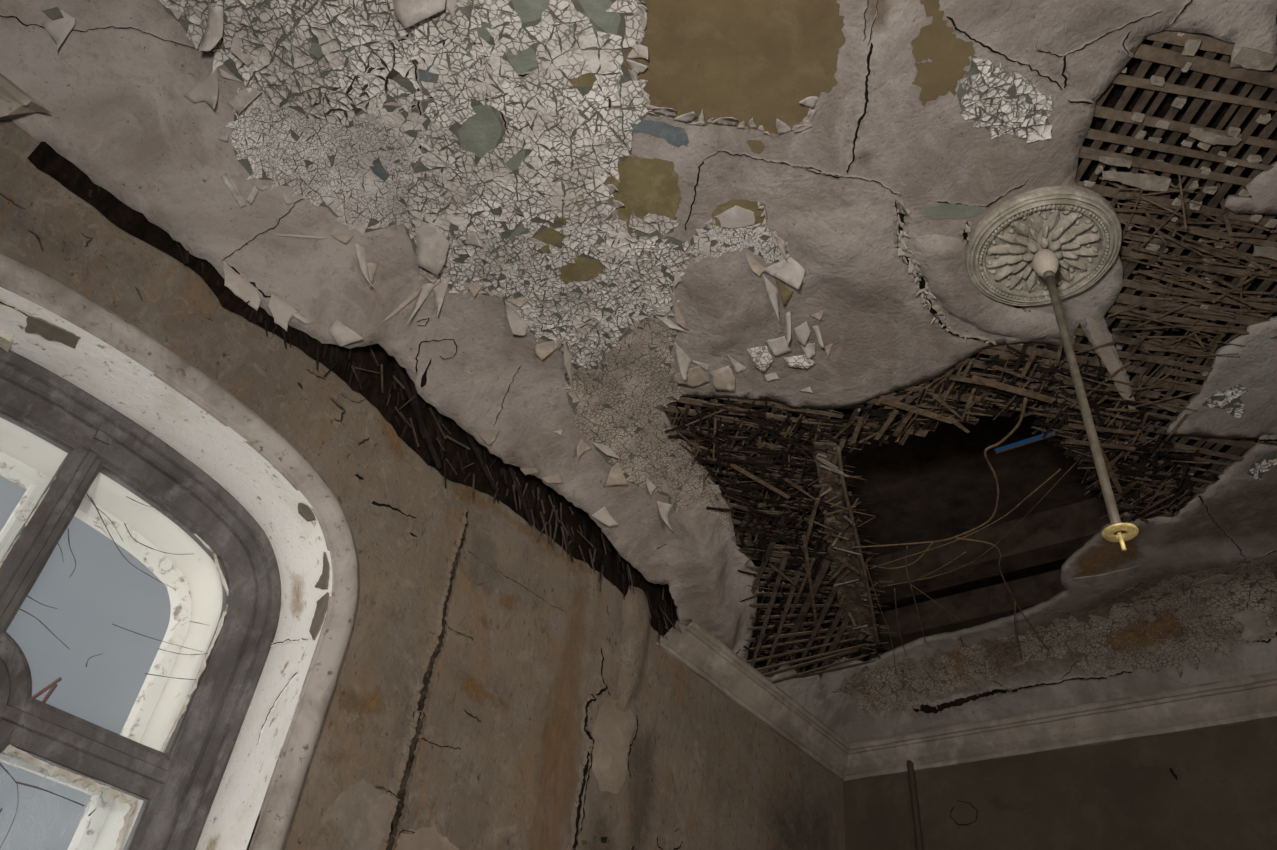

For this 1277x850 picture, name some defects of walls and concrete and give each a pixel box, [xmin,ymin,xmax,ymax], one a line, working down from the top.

crack [683,0,902,231]
crack [945,0,1194,106]
peeling [0,316,81,352]
flaking render [27,142,679,643]
crack [296,368,417,539]
flaking render [159,0,1277,722]
flaking render [332,778,459,850]
crack [372,508,565,850]
crack [566,604,611,850]
flaking render [592,697,636,794]
crack [910,623,1133,721]
water stain [863,562,1277,697]